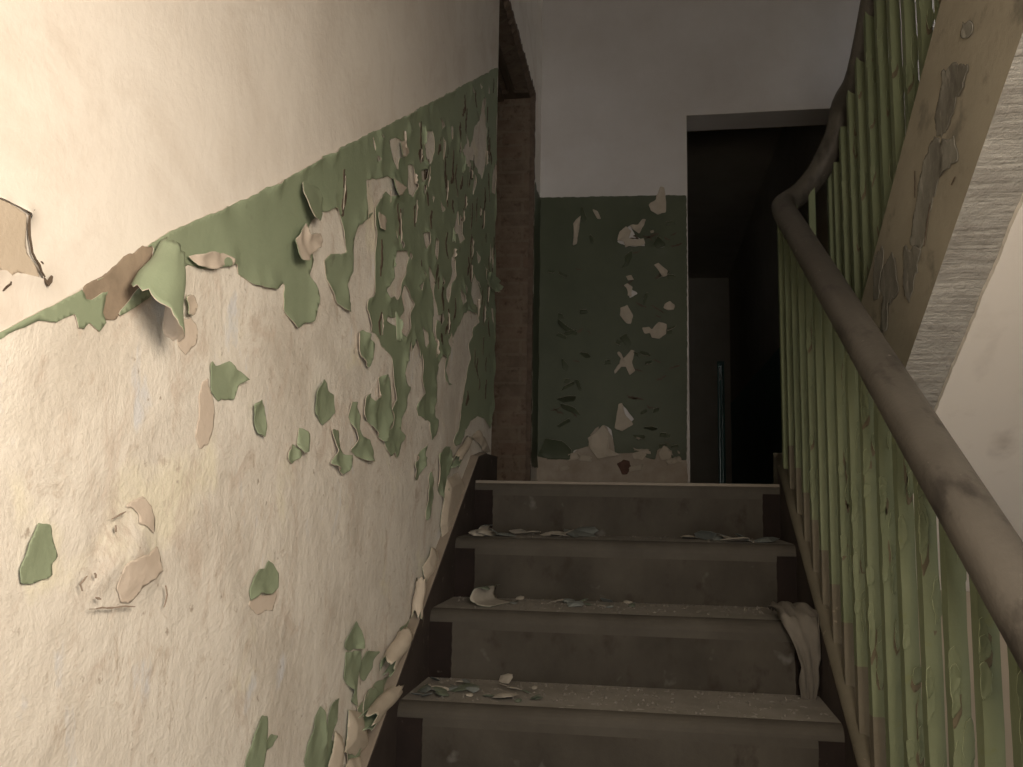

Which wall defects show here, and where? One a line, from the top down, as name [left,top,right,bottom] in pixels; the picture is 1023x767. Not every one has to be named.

peeling [0,68,504,537]
peeling [503,0,688,481]
peeling [19,523,58,584]
peeling [245,715,278,767]
peeling [249,560,279,615]
peeling [304,547,439,767]